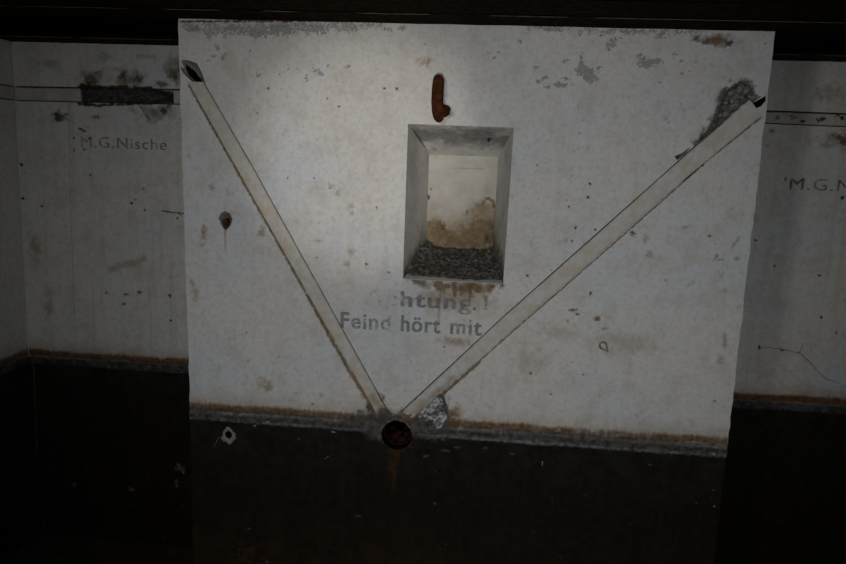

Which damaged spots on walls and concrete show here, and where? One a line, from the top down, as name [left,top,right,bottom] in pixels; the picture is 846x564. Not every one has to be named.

spalling [675,80,760,160]
corrosion [188,85,384,419]
corrosion [412,280,503,300]
corrosion [441,118,761,395]
spalling [415,394,459,435]